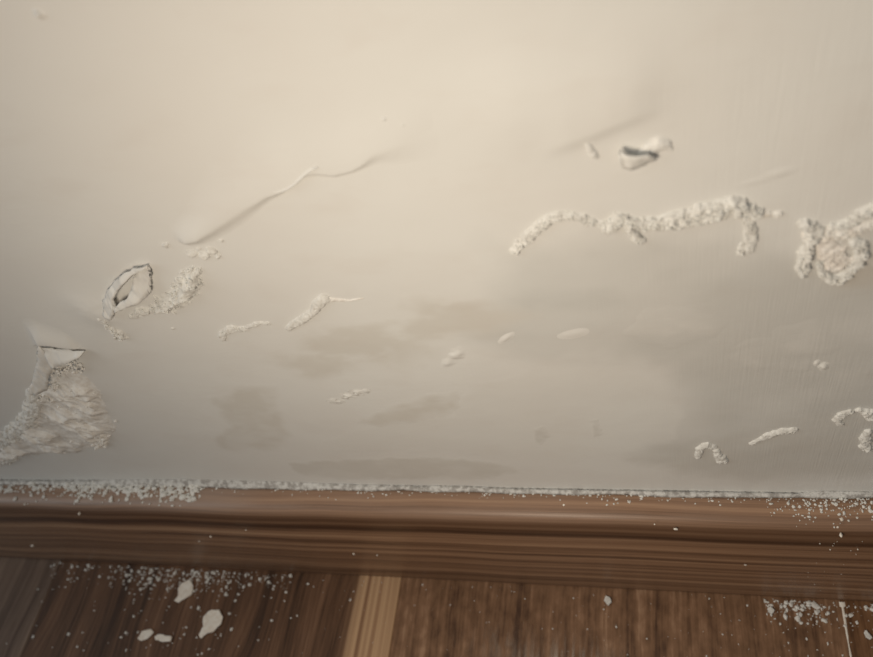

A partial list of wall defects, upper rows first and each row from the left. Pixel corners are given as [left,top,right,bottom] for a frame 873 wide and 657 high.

flaking render [0,318,117,466]
damp [206,383,295,452]
damp [258,196,873,487]